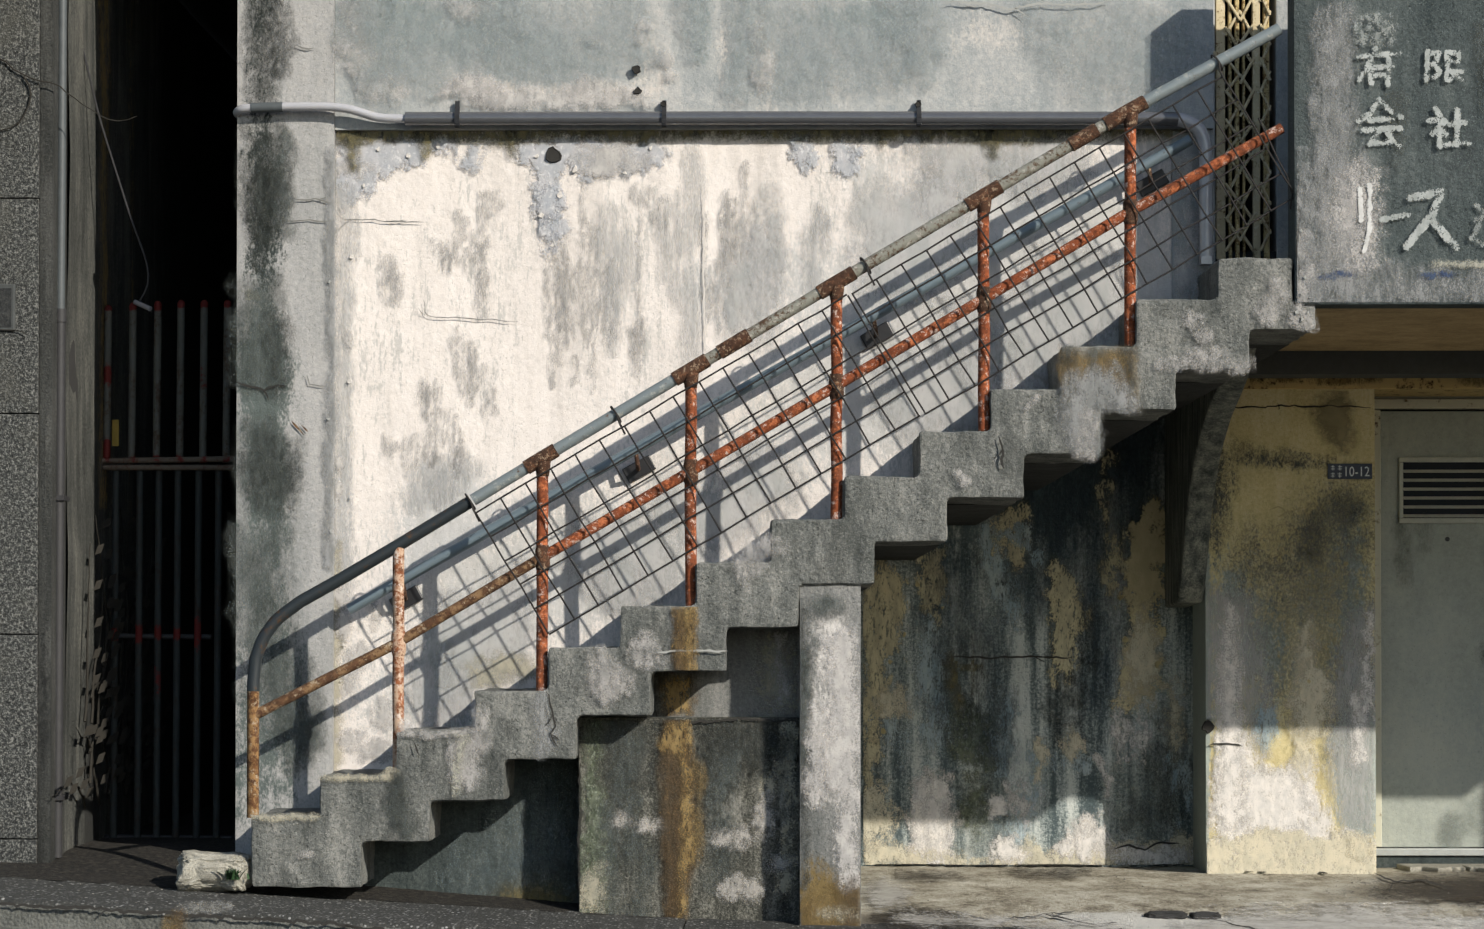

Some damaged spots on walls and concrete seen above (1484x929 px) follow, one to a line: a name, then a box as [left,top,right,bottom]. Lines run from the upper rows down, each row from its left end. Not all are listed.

water stain [243,0,296,104]
water stain [233,121,297,398]
peeling [511,135,673,256]
water stain [722,189,786,345]
water stain [230,415,666,916]
crack [544,692,583,905]
rust [653,607,705,919]
water stain [698,240,1376,926]